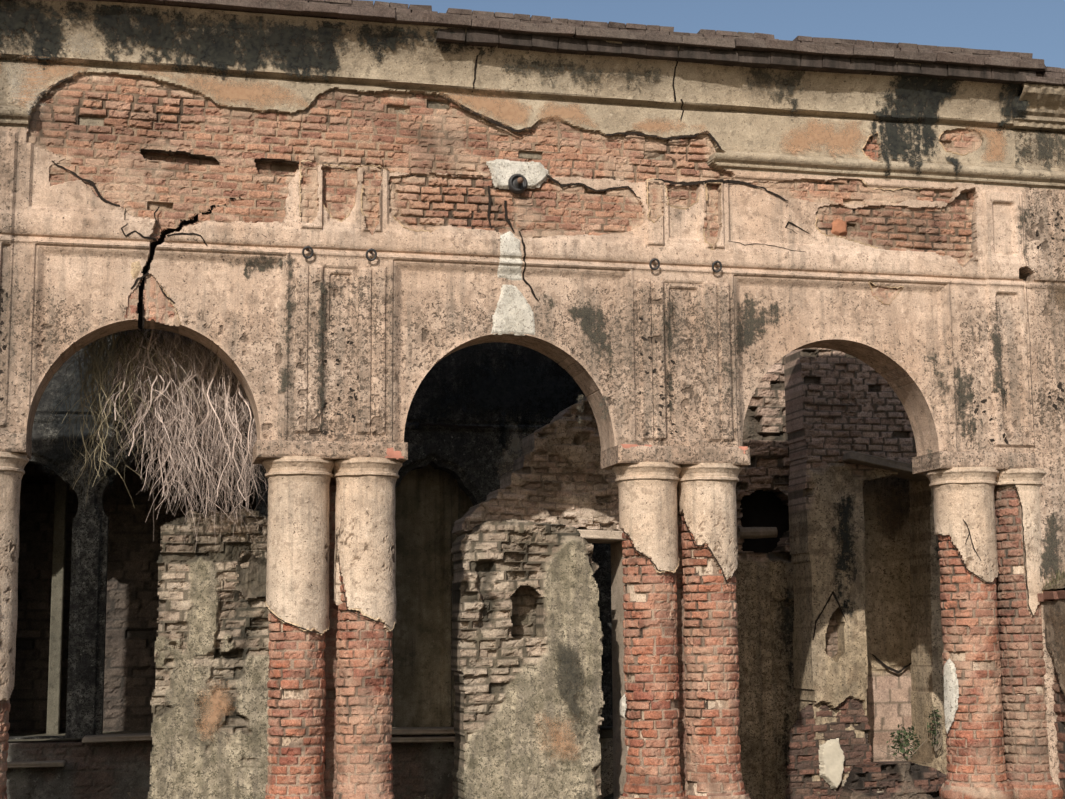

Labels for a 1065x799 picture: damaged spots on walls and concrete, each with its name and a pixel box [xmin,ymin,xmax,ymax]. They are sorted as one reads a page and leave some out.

crack [52,161,241,329]
flaking render [27,74,732,250]
crack [487,186,539,301]
flaking render [750,179,974,267]
damp [904,154,923,174]
damp [945,156,962,176]
peeling [0,699,11,799]
peeling [235,536,397,799]
peeling [620,511,746,799]
peeling [938,479,1065,799]